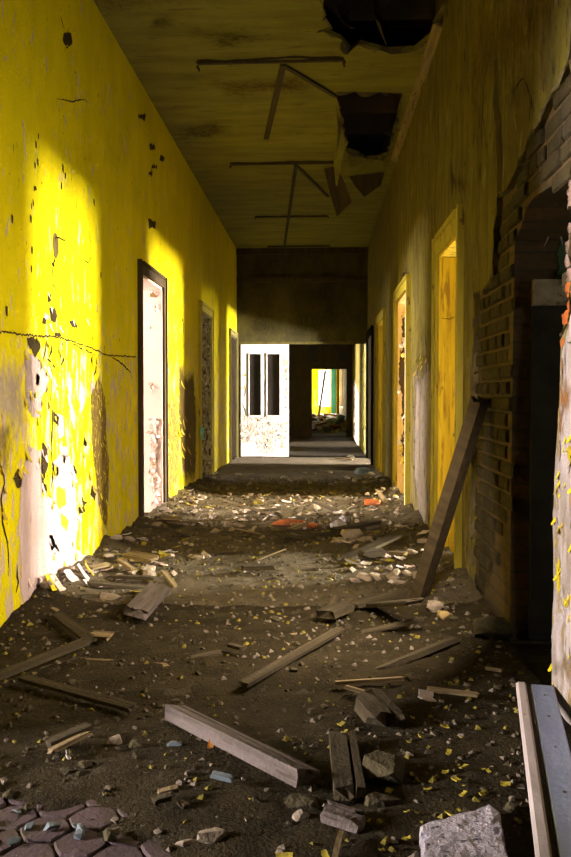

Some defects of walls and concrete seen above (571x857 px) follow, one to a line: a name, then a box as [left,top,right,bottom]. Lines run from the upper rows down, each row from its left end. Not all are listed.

peeling [24,352,51,426]
peeling [19,372,109,603]
crack [0,330,136,593]
peeling [146,362,205,506]
peeling [240,357,289,454]
peeling [397,289,431,526]
flaking render [469,54,571,597]
peeling [548,223,571,725]